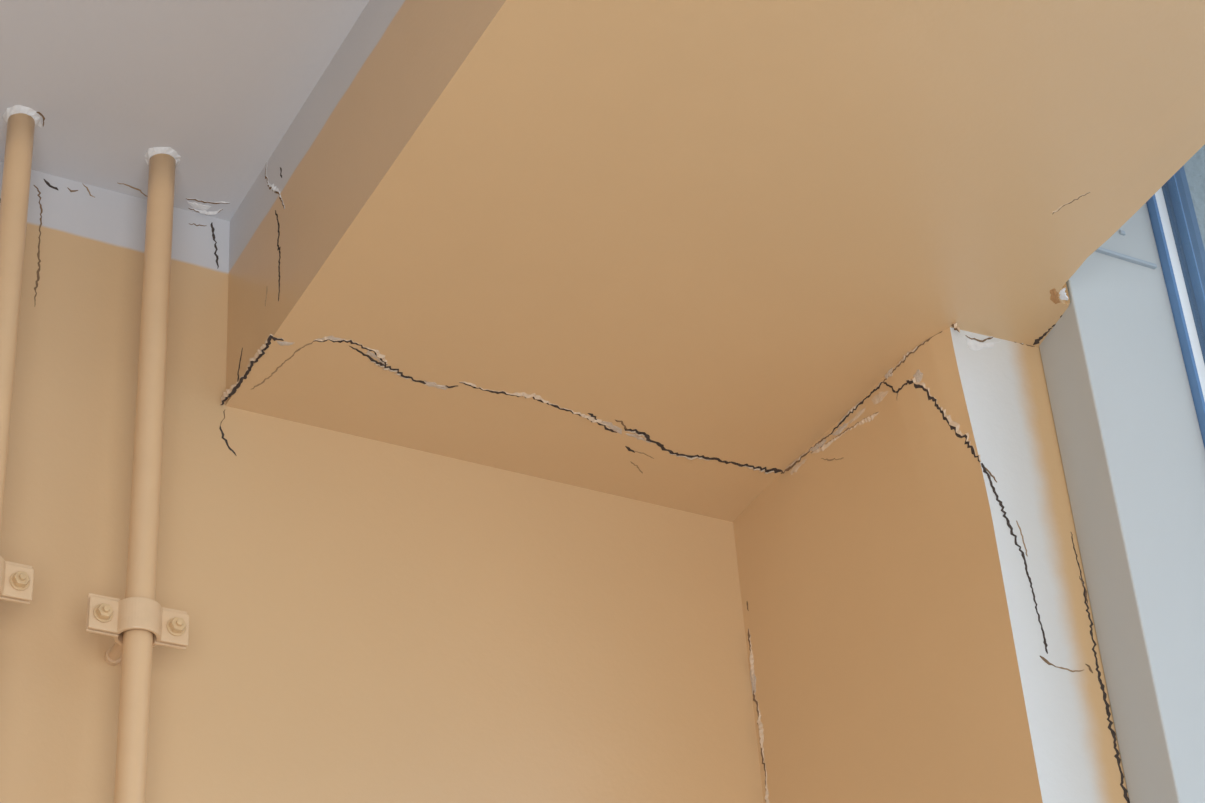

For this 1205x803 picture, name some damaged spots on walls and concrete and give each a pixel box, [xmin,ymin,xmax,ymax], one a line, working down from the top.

crack [34,147,181,301]
crack [211,223,219,269]
crack [219,162,1130,803]